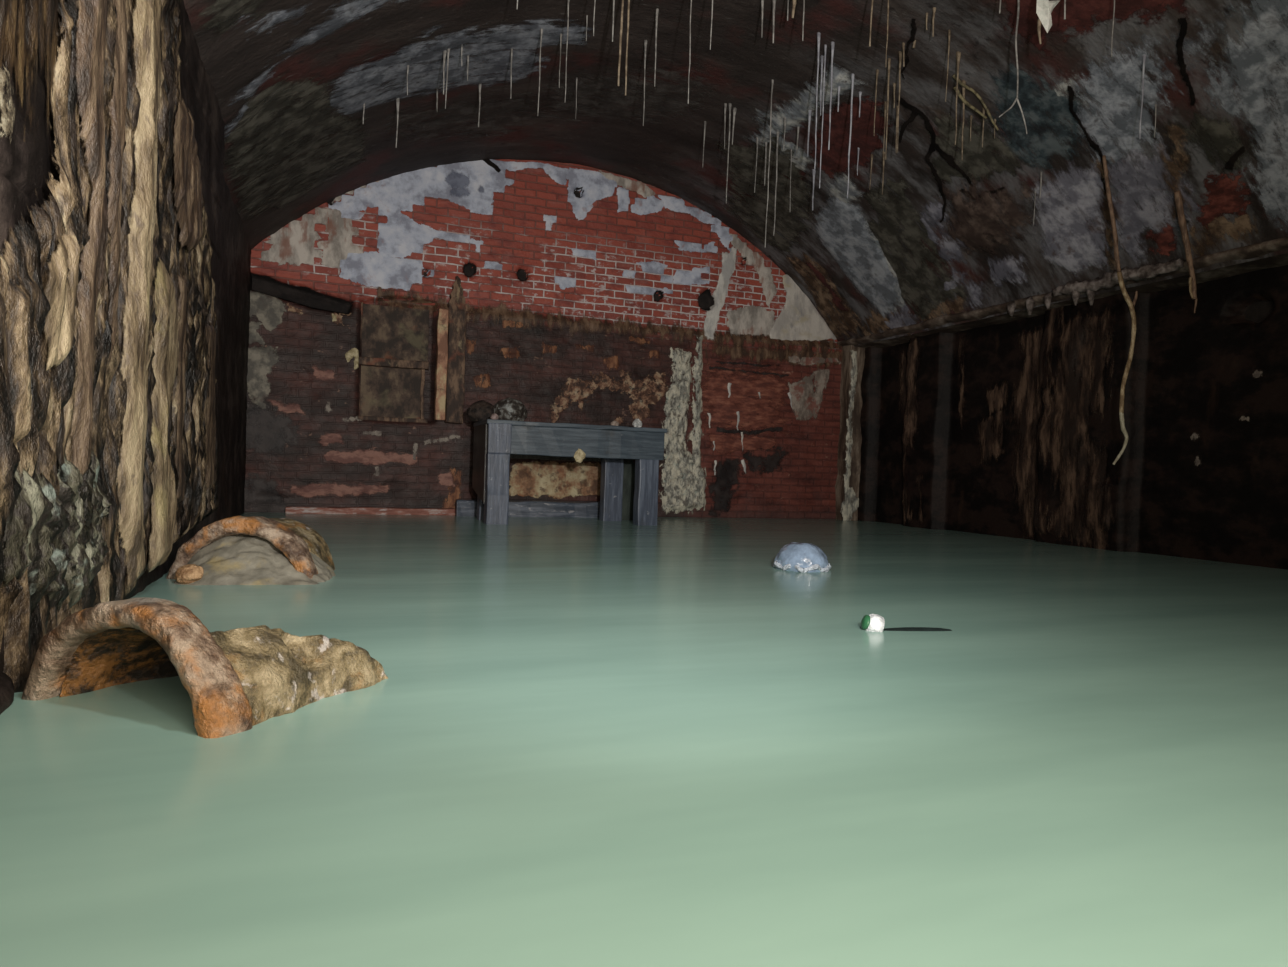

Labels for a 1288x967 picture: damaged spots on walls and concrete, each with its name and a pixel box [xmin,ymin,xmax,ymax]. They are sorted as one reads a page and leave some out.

damp [224,0,408,137]
damp [750,66,866,172]
crack [897,18,1004,223]
damp [988,64,1085,170]
crack [1067,86,1106,193]
crack [1176,18,1196,105]
flaking render [247,96,1030,463]
damp [1007,258,1184,316]
damp [465,247,859,521]
spalling [290,483,389,498]
spalling [319,433,418,465]
spalling [438,472,455,487]